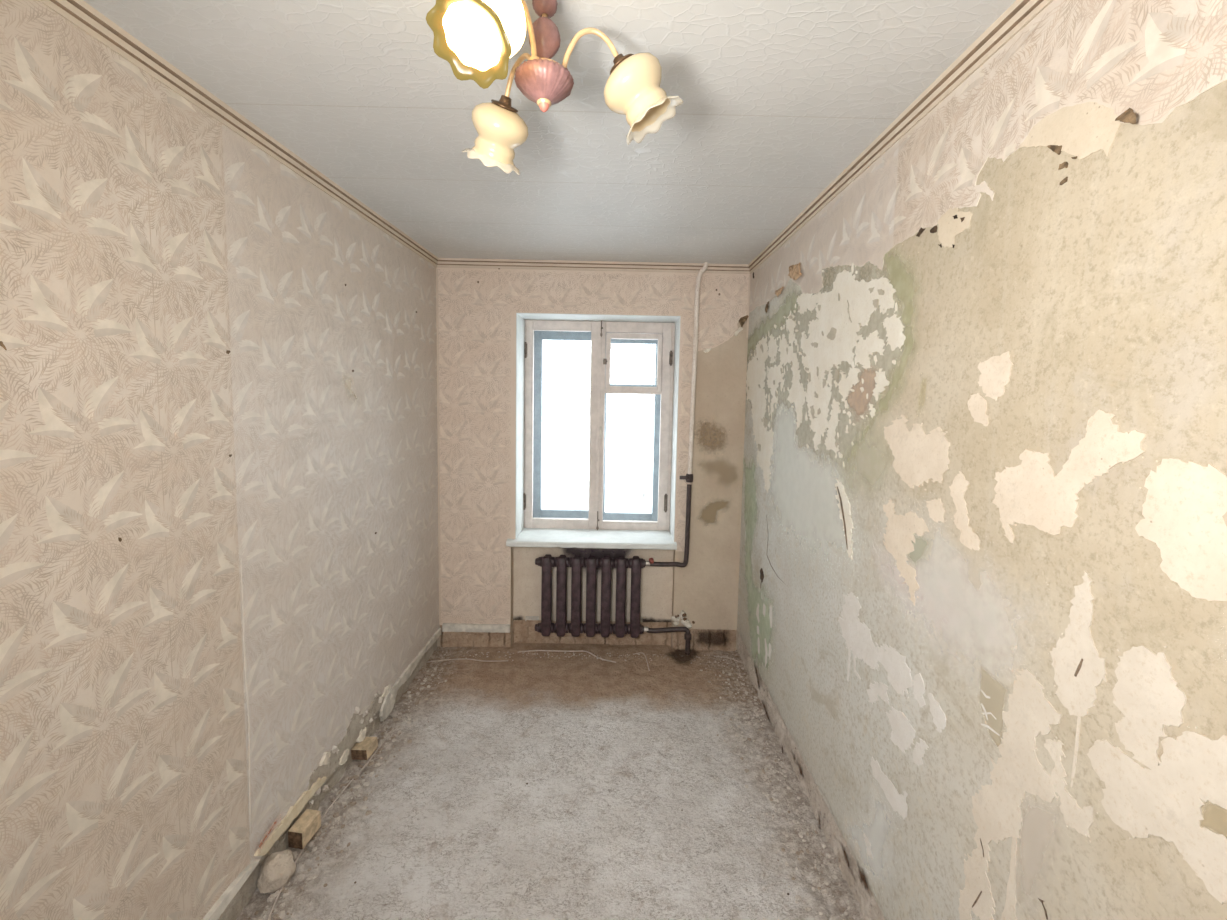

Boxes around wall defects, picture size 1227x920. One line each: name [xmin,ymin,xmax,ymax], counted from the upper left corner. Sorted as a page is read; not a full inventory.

peeling [746,263,981,606]
peeling [967,351,1014,426]
peeling [992,409,1227,601]
flaking render [218,610,888,920]
peeling [870,757,908,820]
peeling [838,592,947,767]
peeling [958,571,1227,920]